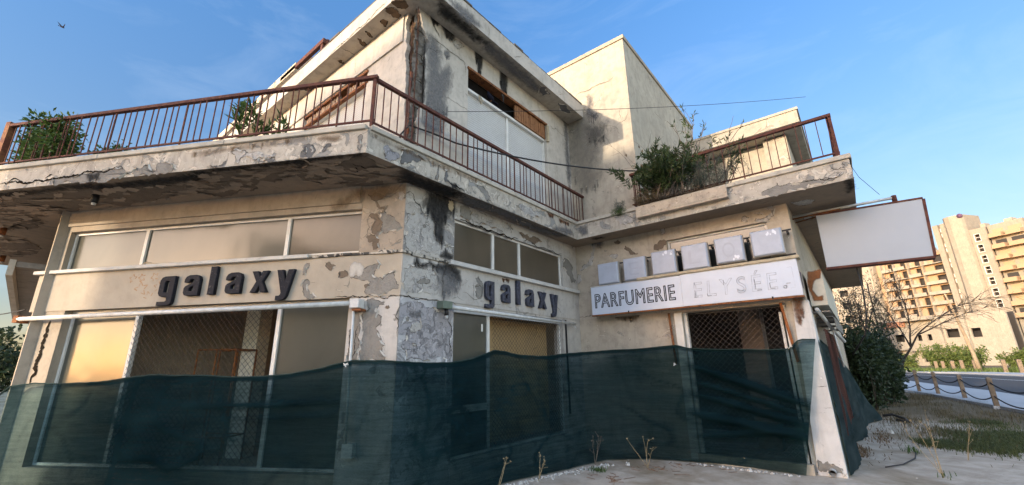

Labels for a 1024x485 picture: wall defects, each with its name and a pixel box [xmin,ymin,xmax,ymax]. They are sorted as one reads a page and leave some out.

leakage [423,0,539,133]
crack [1,166,122,184]
peeling [0,0,542,361]
leakage [356,167,603,300]
peeling [761,172,844,206]
crack [29,321,51,383]